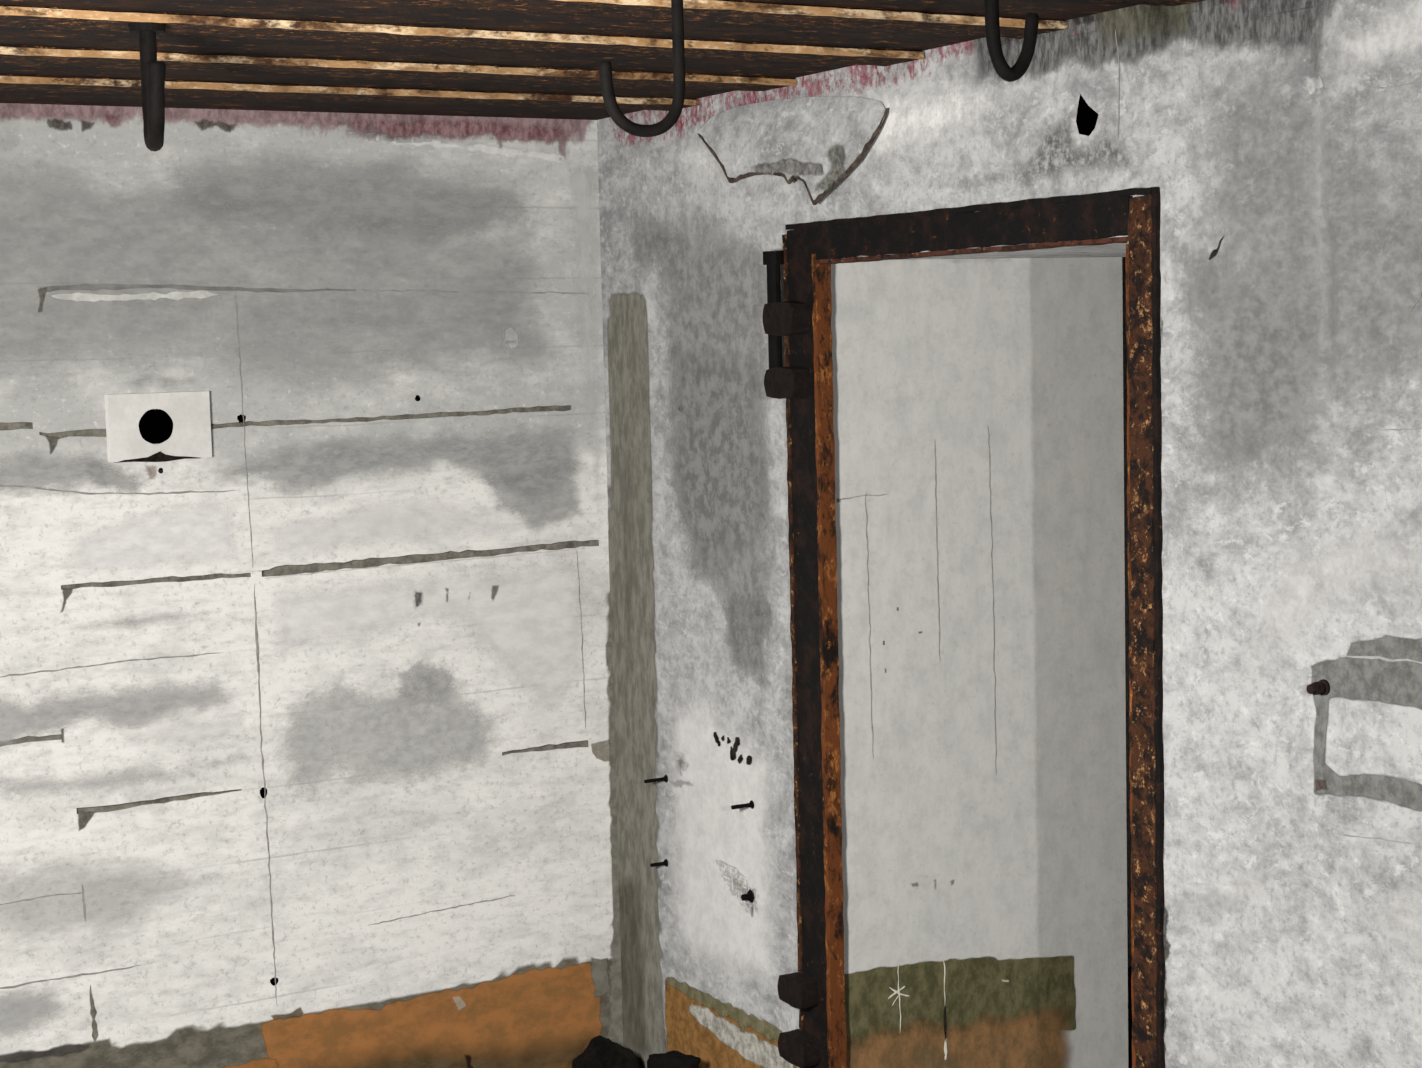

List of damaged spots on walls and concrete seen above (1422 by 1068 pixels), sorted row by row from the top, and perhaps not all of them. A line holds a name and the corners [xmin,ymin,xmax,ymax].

damp [193,167,508,228]
damp [0,458,135,490]
damp [247,434,576,526]
damp [635,223,771,673]
peeling [0,293,796,1068]